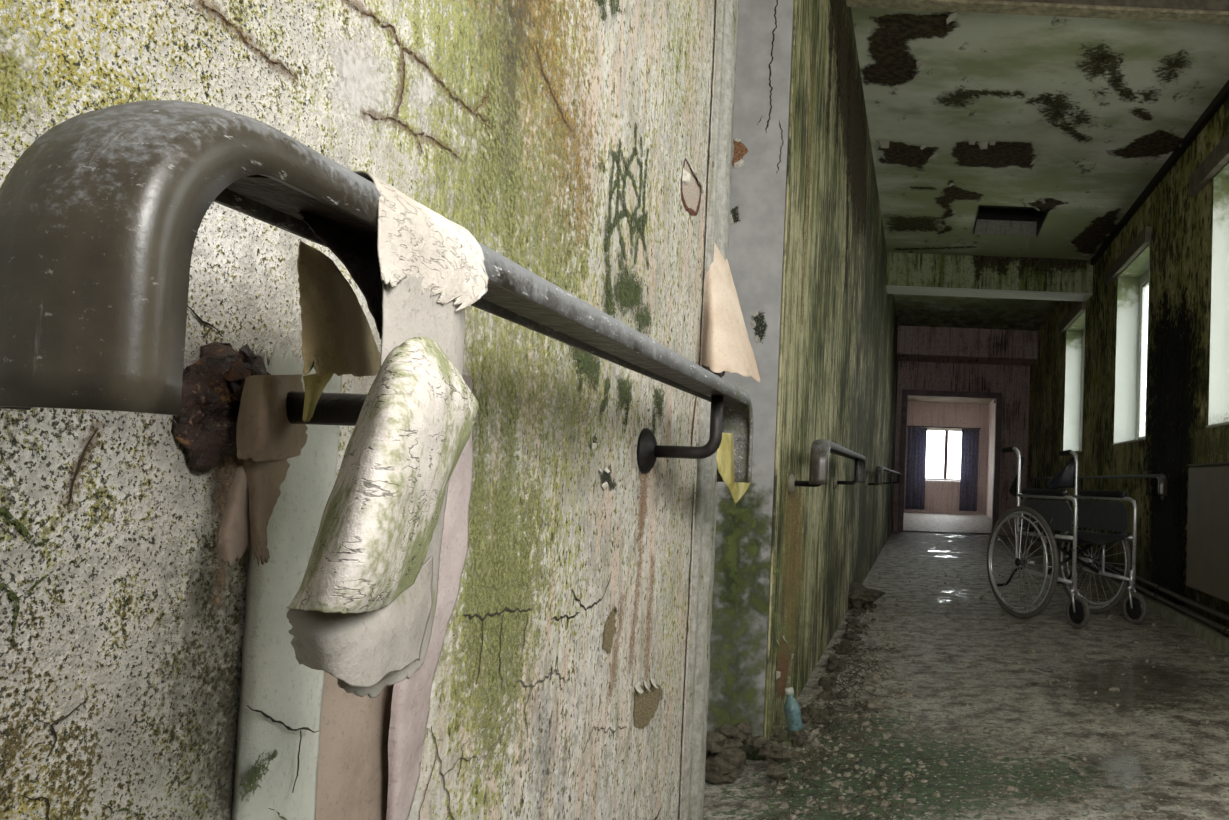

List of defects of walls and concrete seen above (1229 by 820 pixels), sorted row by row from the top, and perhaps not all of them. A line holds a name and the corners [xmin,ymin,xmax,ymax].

crack [200,0,294,77]
crack [347,0,494,158]
spalling [861,12,958,90]
spalling [876,139,1039,173]
spalling [1106,130,1183,160]
spalling [936,180,983,234]
peeling [750,310,768,344]
peeling [286,170,489,820]
leakage [457,376,540,767]
peeling [603,602,618,653]
peeling [634,679,665,729]
crack [247,705,318,820]